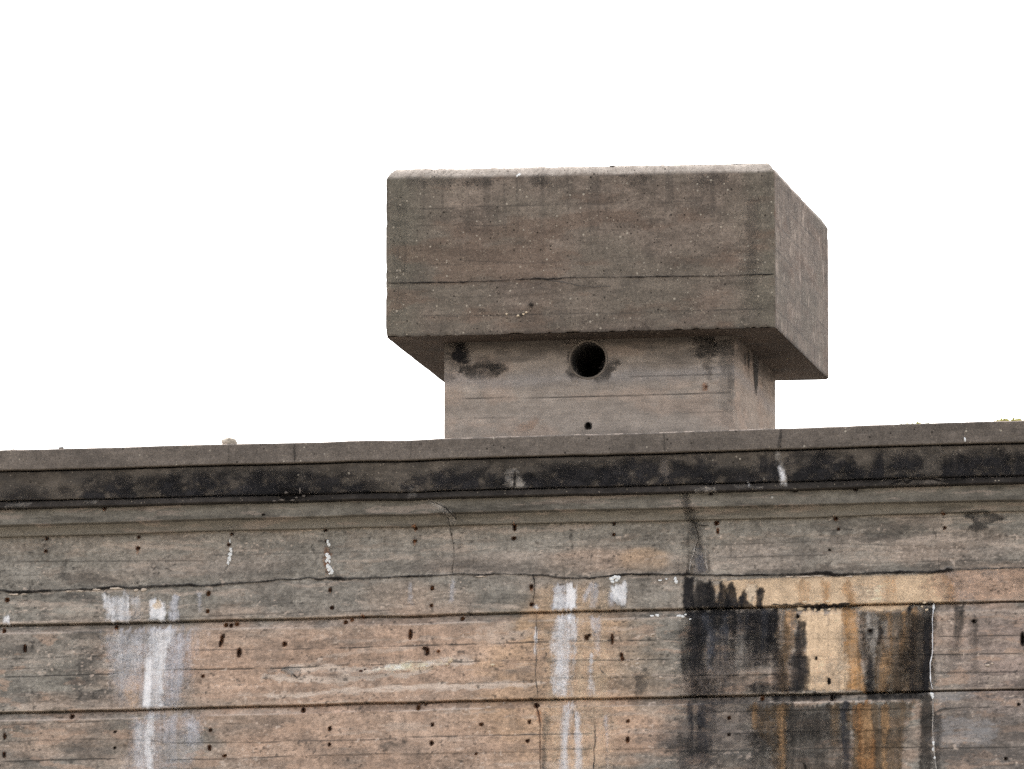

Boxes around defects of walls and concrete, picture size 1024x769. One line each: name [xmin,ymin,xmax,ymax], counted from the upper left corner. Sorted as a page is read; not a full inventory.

leakage [446,342,506,377]
leakage [81,472,378,500]
leakage [400,450,928,503]
leakage [941,450,1024,479]
efflorescence [609,575,627,605]
efflorescence [103,593,183,769]
crack [0,501,1024,769]
efflorescence [551,583,597,691]
leakage [669,546,852,769]
leakage [862,605,941,769]
efflorescence [562,705,581,769]